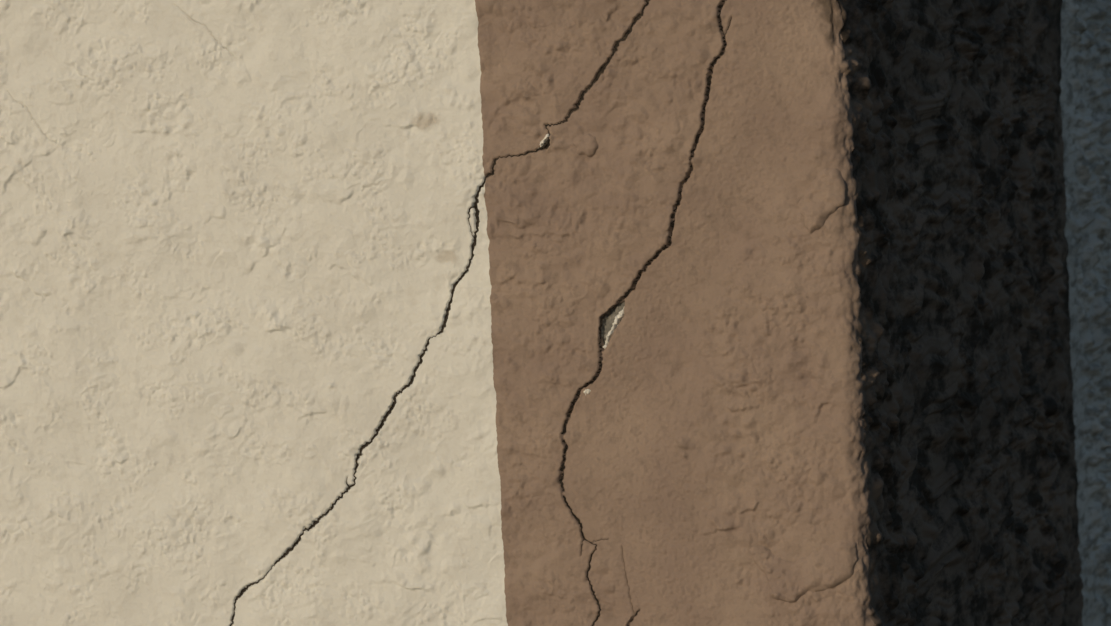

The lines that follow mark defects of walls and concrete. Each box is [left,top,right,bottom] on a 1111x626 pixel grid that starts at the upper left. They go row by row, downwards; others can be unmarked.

crack [230,0,650,626]
spalling [601,301,625,349]
crack [559,1,732,626]